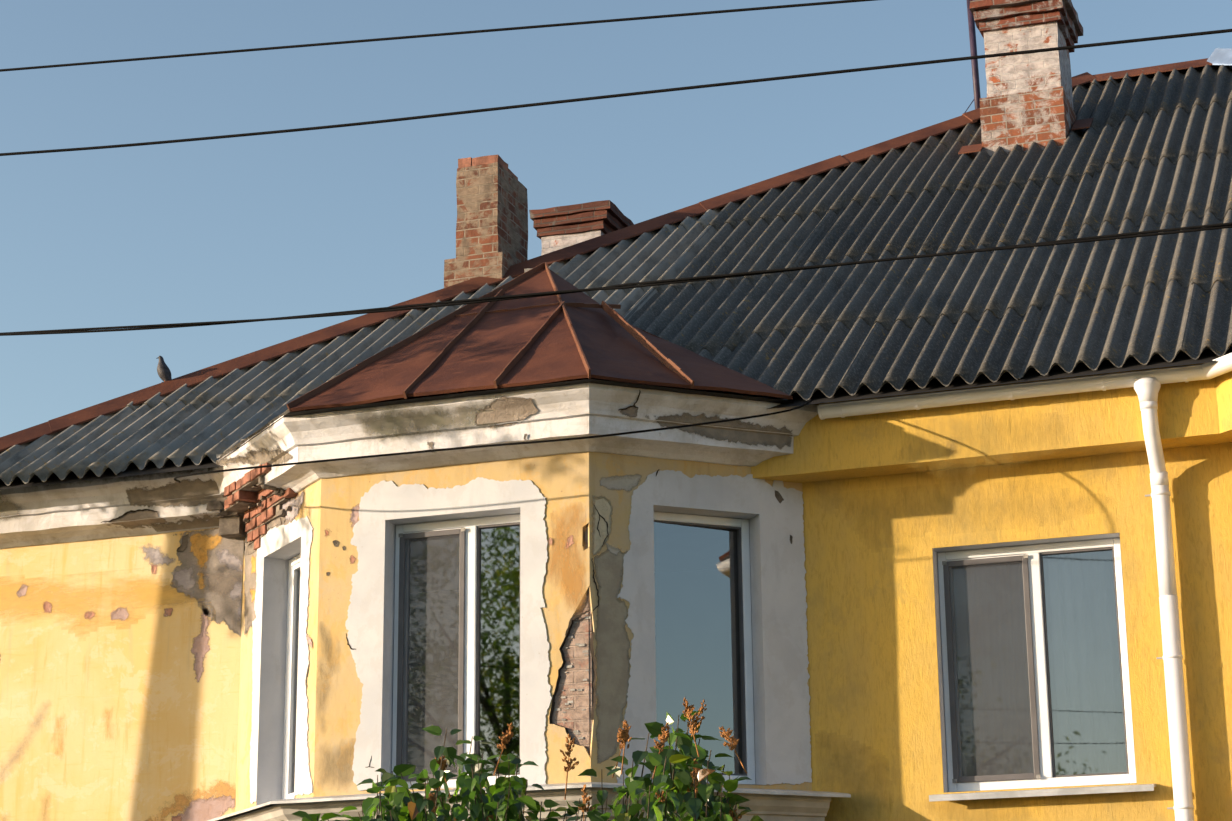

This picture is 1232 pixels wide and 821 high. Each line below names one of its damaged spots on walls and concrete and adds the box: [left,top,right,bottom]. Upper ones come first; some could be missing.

spalling [475,396,538,440]
peeling [618,390,792,449]
peeling [101,447,304,682]
spalling [549,496,620,746]
peeling [171,795,235,821]